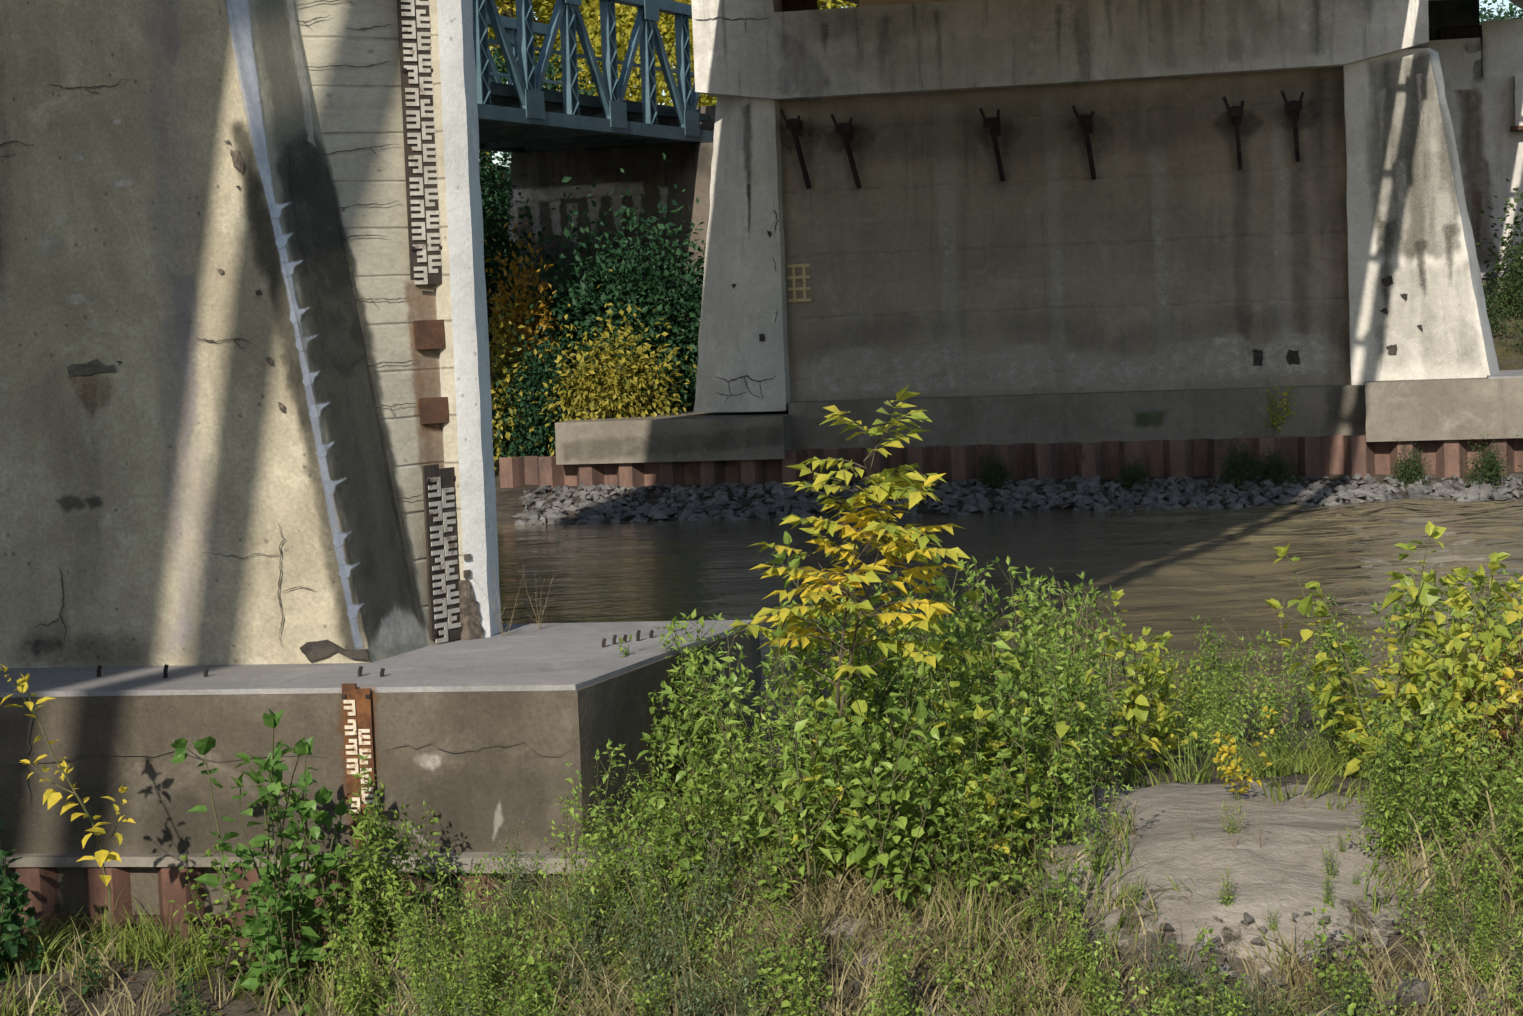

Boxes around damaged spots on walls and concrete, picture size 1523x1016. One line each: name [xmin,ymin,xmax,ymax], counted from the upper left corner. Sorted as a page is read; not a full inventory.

crack [49,79,127,94]
crack [0,141,35,157]
water stain [1376,47,1497,297]
spalling [1381,276,1408,302]
water stain [227,0,425,650]
spalling [67,359,122,376]
crack [717,375,776,400]
crack [205,524,317,644]
crack [35,569,67,641]